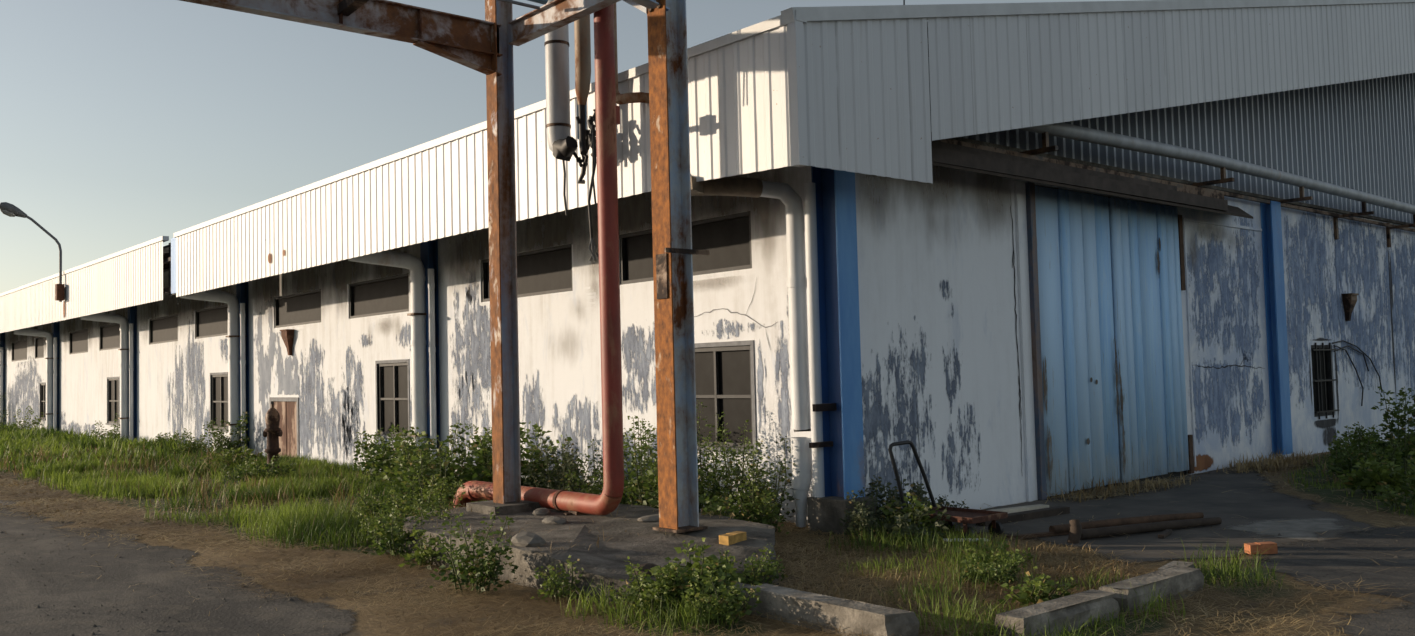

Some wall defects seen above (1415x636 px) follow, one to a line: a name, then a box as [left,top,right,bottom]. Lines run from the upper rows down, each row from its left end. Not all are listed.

peeling [167,317,213,446]
peeling [253,304,398,466]
peeling [450,271,491,476]
peeling [522,372,603,476]
peeling [621,322,656,414]
crack [694,279,777,350]
peeling [862,316,980,507]
peeling [1187,217,1266,446]
peeling [1284,203,1415,403]